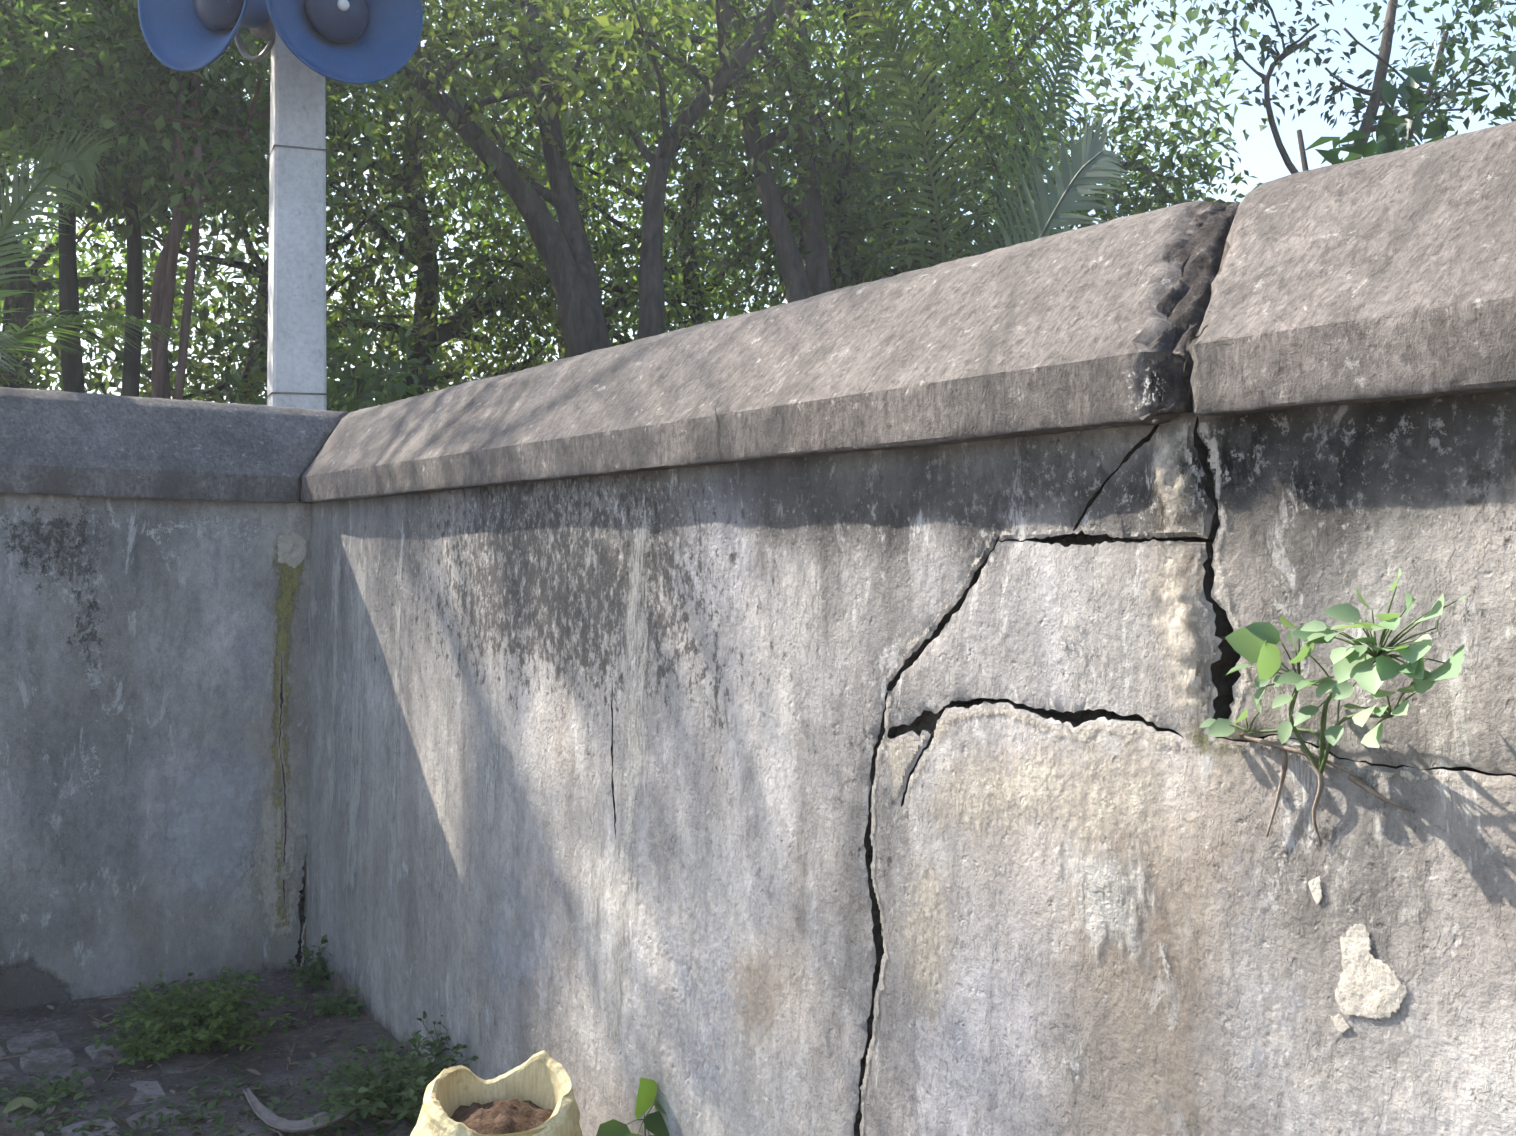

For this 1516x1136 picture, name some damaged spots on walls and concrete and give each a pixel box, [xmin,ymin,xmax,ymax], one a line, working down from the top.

water stain [3,515,100,635]
crack [854,417,1516,1136]
peeling [1308,876,1322,904]
water stain [0,959,71,1011]
peeling [1330,923,1407,1033]